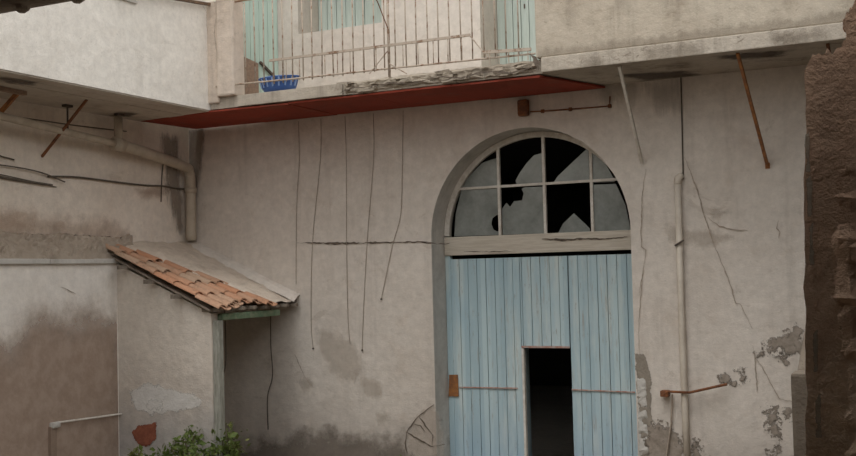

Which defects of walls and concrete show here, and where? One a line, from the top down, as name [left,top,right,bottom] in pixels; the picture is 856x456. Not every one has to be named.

crack [638,173,646,353]
crack [685,159,792,402]
peeling [753,323,804,366]
peeling [130,383,201,447]
crack [405,405,445,452]
spalling [635,354,704,456]
corrosion [660,383,727,456]
peeling [717,367,747,387]
peeling [762,405,792,456]